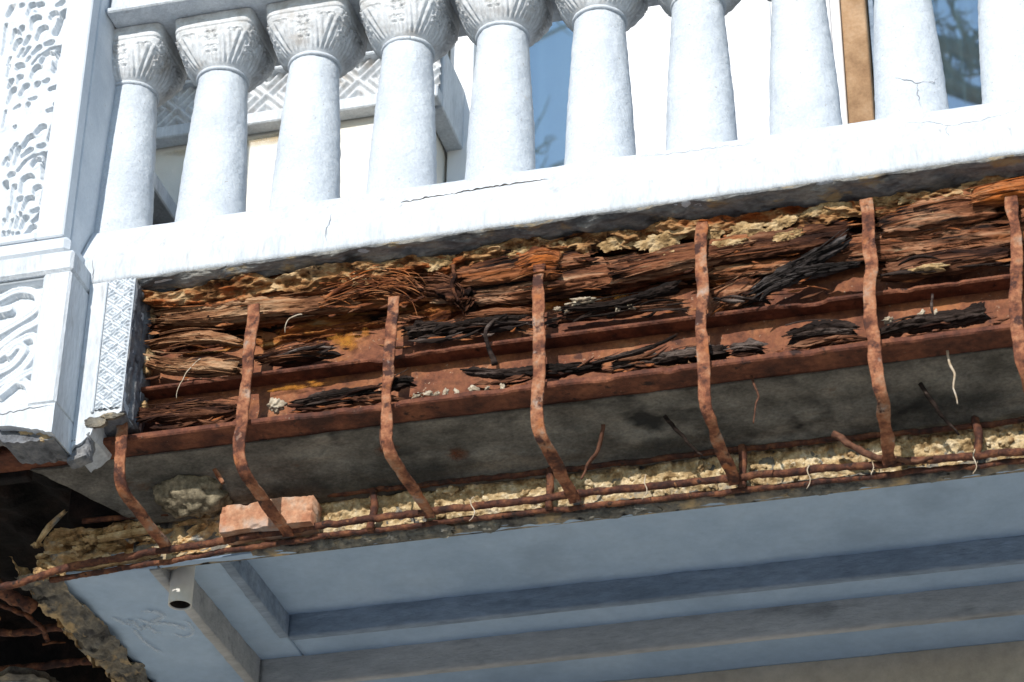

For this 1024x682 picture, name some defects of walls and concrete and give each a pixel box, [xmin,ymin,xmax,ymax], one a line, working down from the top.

crack [895,77,1023,134]
crack [402,179,543,202]
rust [321,329,368,347]
spalling [0,175,1022,469]
spalling [9,422,1024,682]